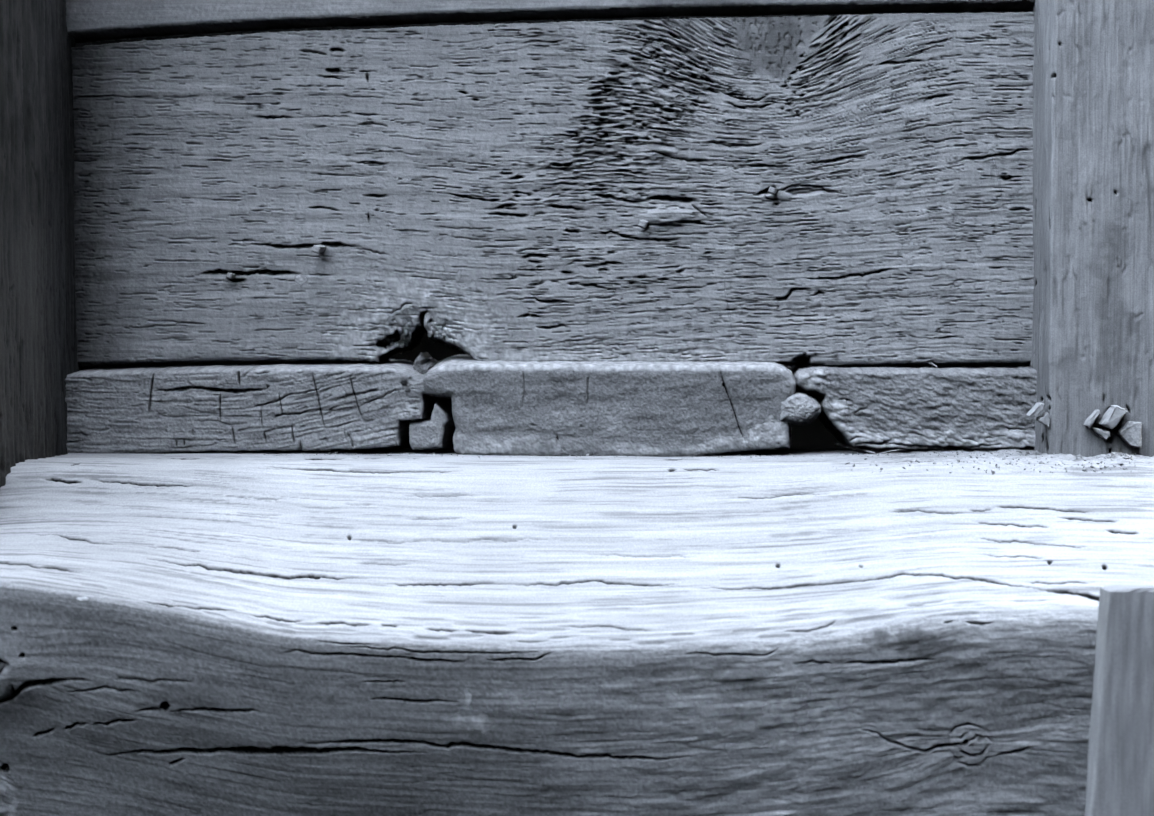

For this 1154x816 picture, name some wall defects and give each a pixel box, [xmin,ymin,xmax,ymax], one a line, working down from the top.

crack [171,548,353,580]
crack [722,507,1136,601]
crack [0,659,251,736]
crack [134,739,658,764]
crack [876,724,1026,766]